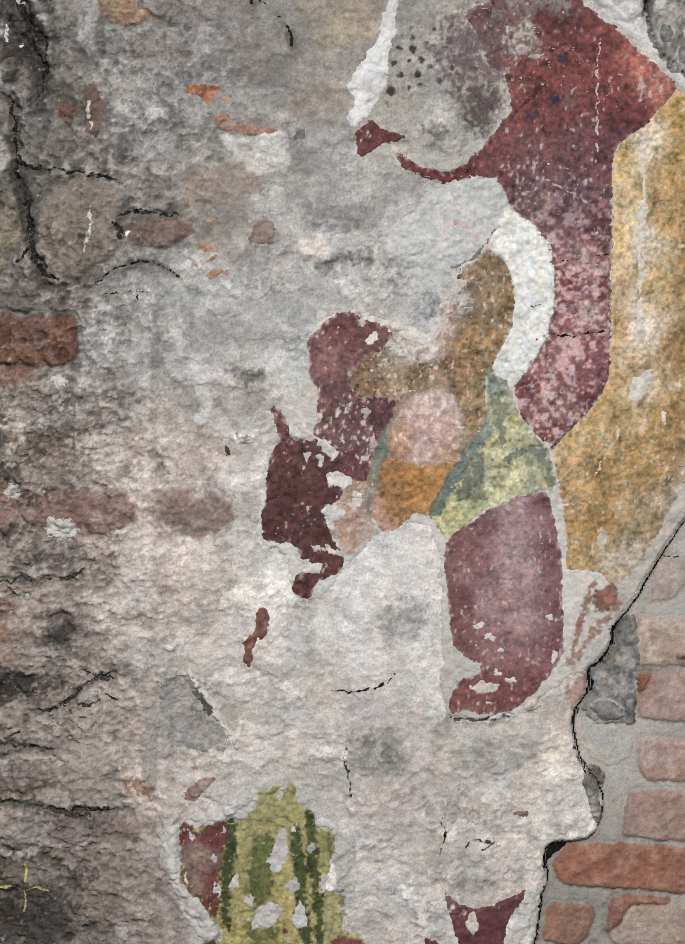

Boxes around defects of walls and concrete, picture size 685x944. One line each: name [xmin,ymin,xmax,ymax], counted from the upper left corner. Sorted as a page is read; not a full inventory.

flaking render [59,84,104,137]
flaking render [185,83,278,136]
crack [18,158,123,185]
peeling [633,131,650,348]
crack [94,259,180,295]
crack [536,330,606,340]
peeling [628,369,653,403]
peeling [597,527,608,551]
peeling [473,621,504,652]
flaking render [156,668,240,753]
crack [533,521,685,944]